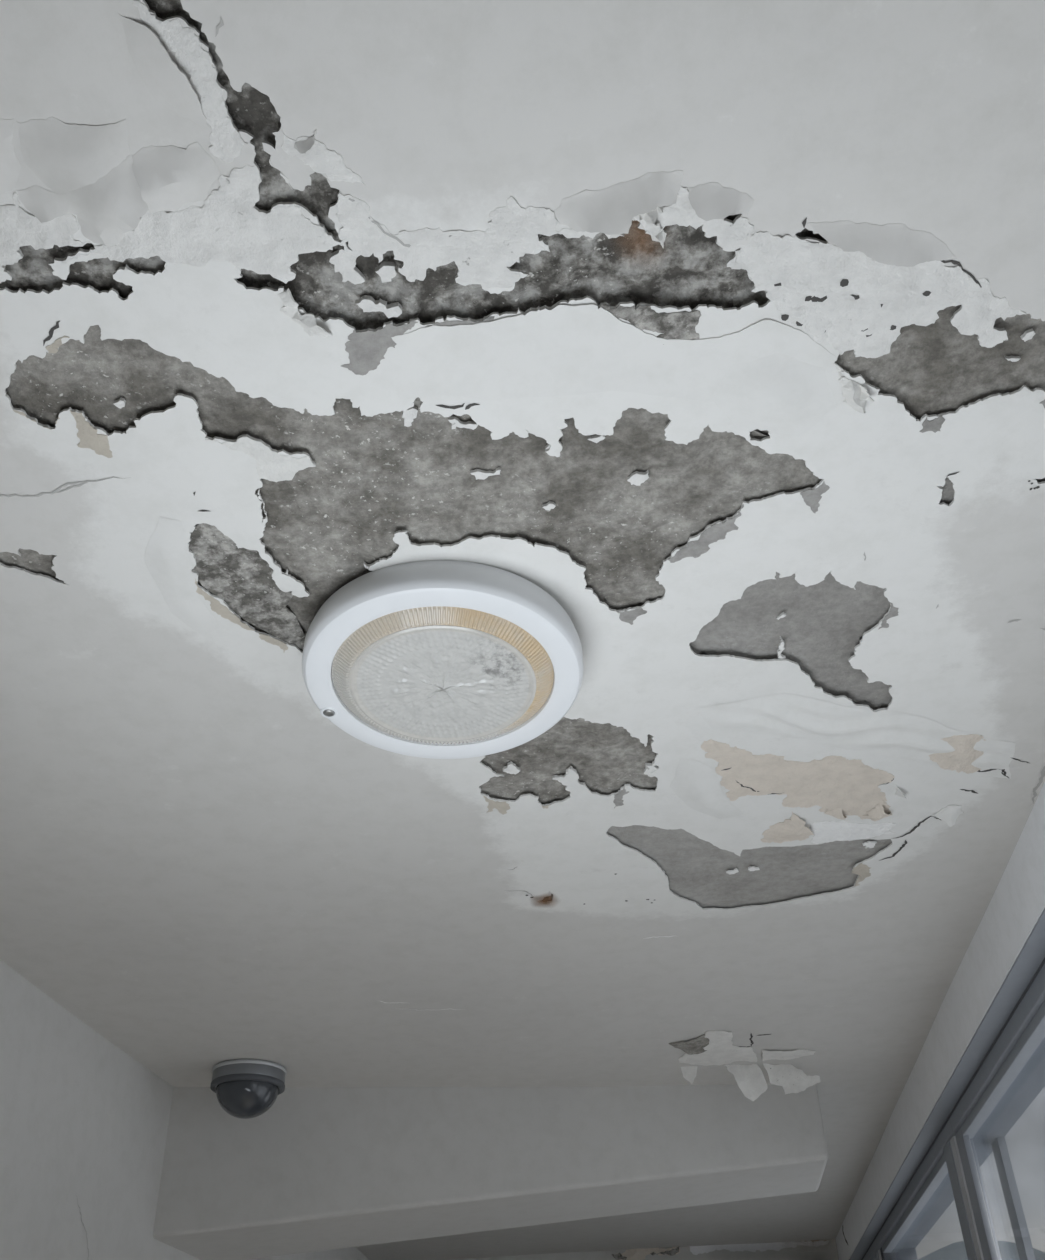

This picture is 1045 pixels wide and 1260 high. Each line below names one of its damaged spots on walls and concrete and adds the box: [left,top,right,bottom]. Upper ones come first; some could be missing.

spalling [0,0,1045,652]
crack [0,477,121,497]
spalling [689,572,899,710]
spalling [479,717,658,815]
spalling [606,739,906,908]
peeling [669,1030,820,1101]